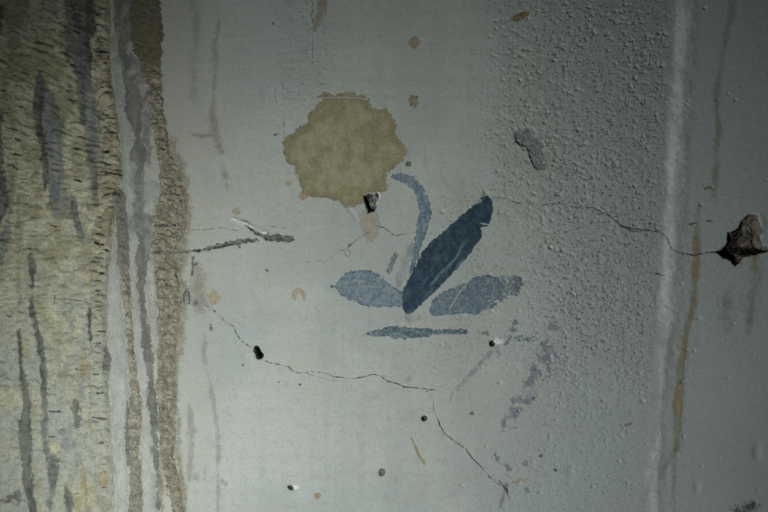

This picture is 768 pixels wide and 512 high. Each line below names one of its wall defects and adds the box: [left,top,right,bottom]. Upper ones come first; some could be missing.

damp [0,112,15,264]
damp [33,73,86,243]
damp [64,0,102,206]
damp [103,0,162,512]
crack [154,218,294,254]
spalling [275,91,412,208]
crack [494,197,718,256]
damp [0,254,74,512]
damp [61,377,86,472]
crack [265,361,508,495]
corrosion [673,223,700,461]